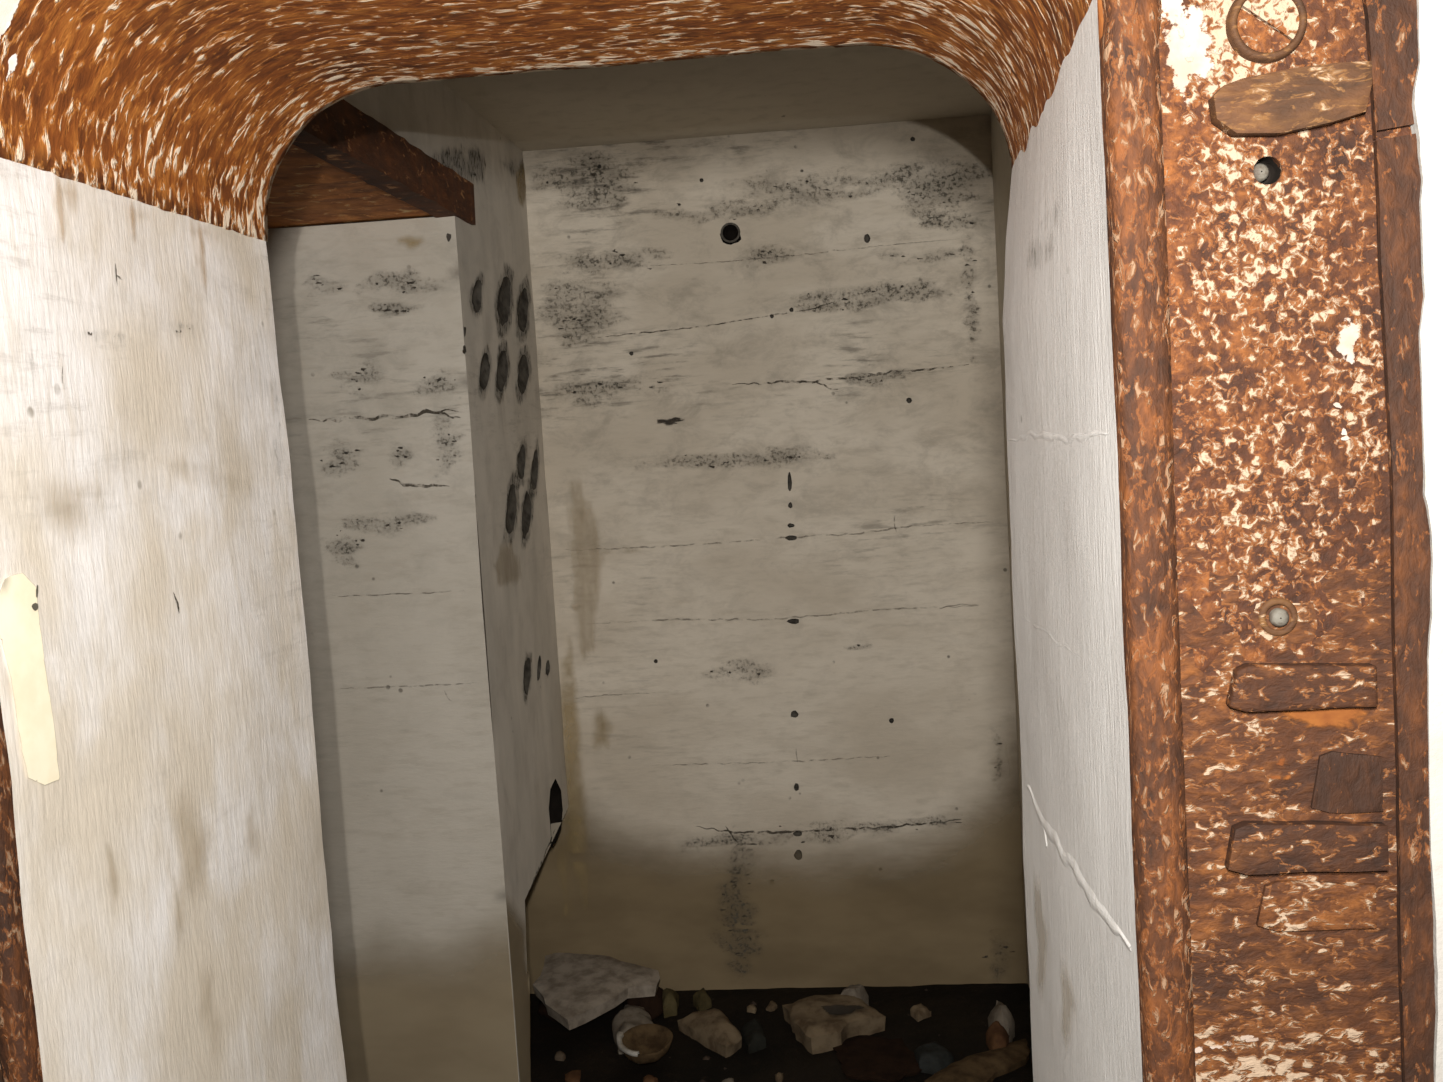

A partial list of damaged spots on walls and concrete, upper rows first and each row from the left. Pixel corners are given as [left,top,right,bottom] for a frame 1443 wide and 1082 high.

peeling [0,0,20,39]
peeling [6,53,17,81]
leakage [504,164,526,203]
leakage [543,154,636,207]
mould [733,164,990,227]
leakage [372,272,416,314]
leakage [547,284,607,346]
leakage [802,282,934,312]
leakage [657,417,683,425]
peeling [0,573,60,785]
rust [1281,708,1366,727]
leakage [335,703,1044,1082]